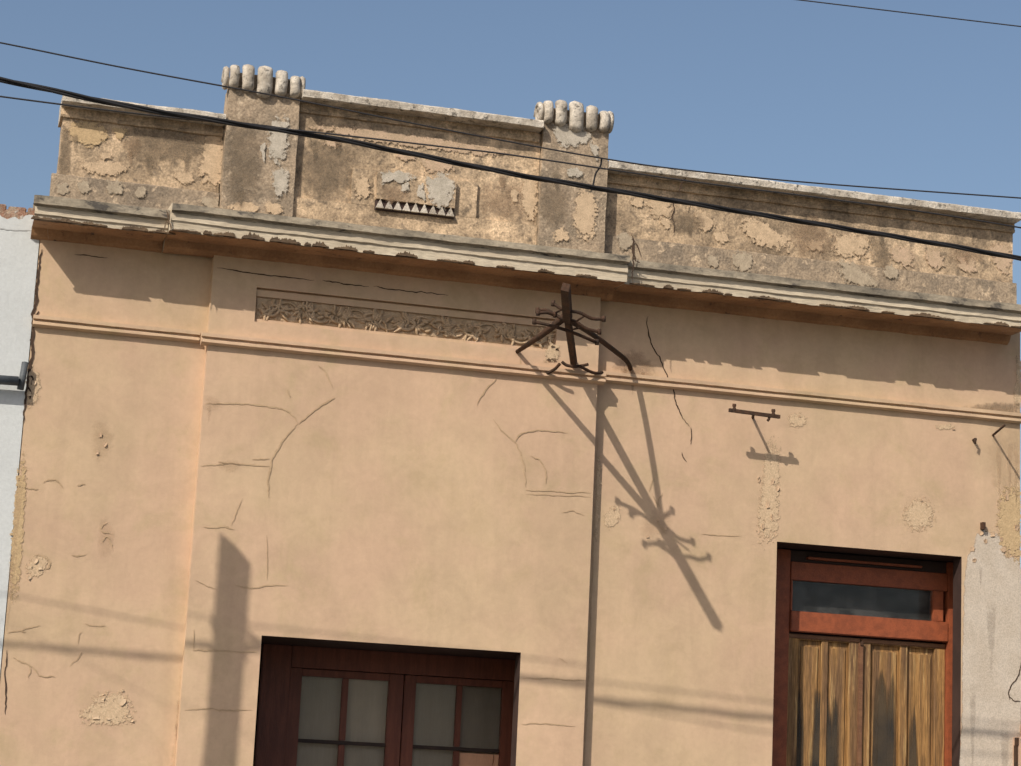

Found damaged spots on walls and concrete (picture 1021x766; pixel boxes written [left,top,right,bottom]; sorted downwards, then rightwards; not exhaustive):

peeling [56,118,146,198]
peeling [173,130,225,186]
peeling [201,116,290,215]
peeling [552,168,598,242]
peeling [630,193,672,229]
peeling [707,216,794,272]
peeling [806,233,914,287]
peeling [989,241,1014,277]
crack [646,317,692,462]
crack [204,365,334,497]
peeling [959,480,1021,766]
crack [4,623,105,711]